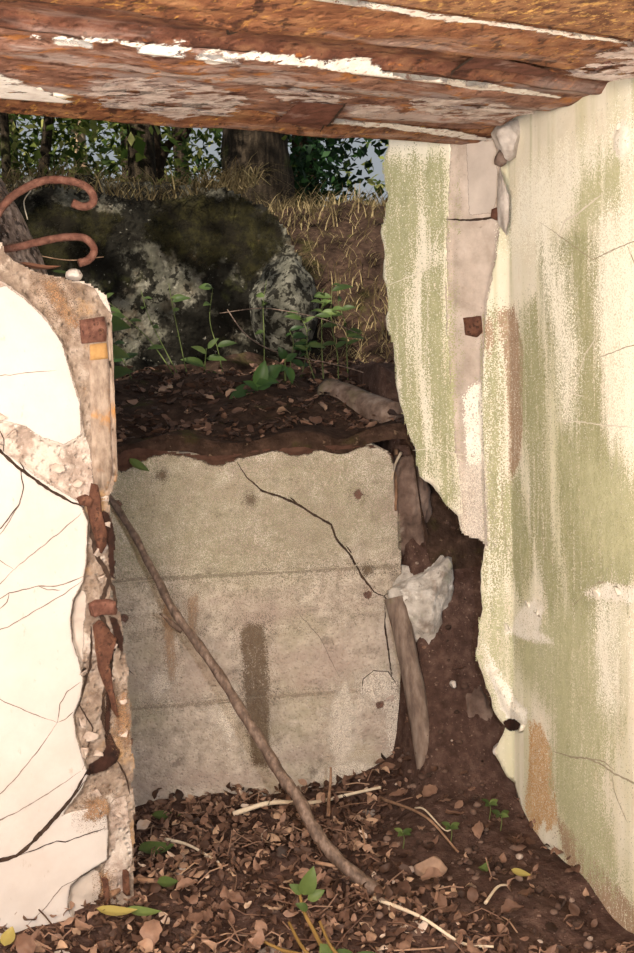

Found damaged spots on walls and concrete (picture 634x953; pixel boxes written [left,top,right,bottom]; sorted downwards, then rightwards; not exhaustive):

peeling [52,37,93,49]
peeling [136,40,240,65]
peeling [86,77,250,120]
peeling [264,87,395,117]
peeling [408,96,535,123]
damp [406,142,473,509]
damp [475,83,634,734]
crack [237,462,396,748]
crack [0,431,133,862]
damp [214,621,272,769]
corrosion [82,795,110,824]